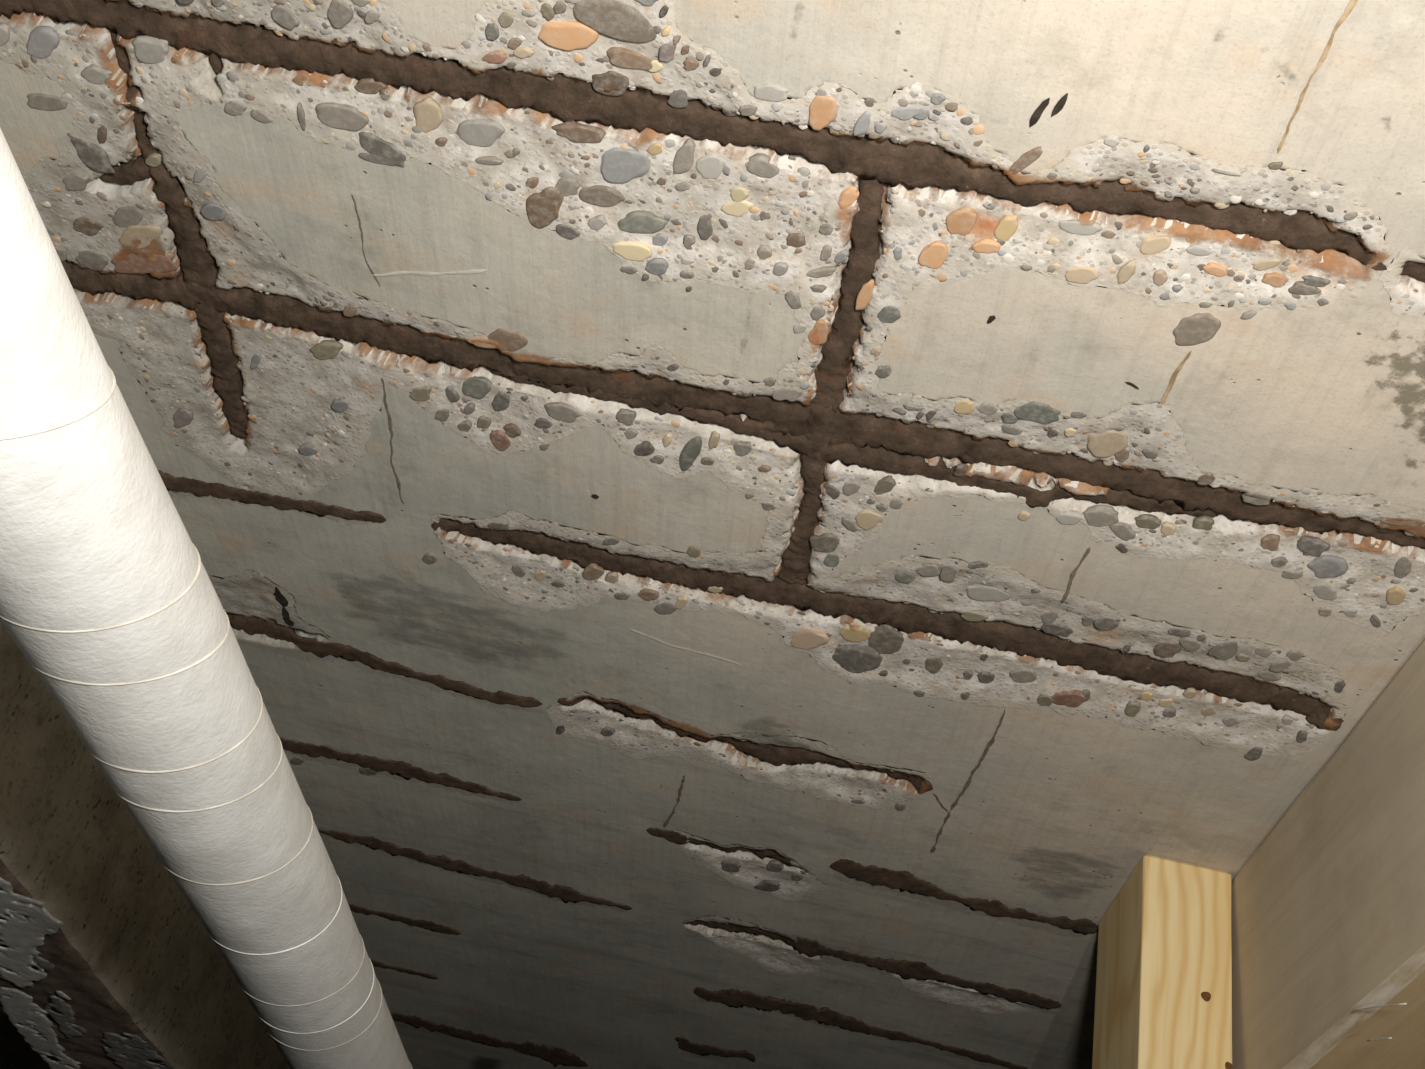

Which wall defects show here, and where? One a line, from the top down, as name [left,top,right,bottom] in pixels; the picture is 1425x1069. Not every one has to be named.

crack [1278,0,1358,153]
corrosion [114,238,181,281]
corrosion [973,219,999,236]
spalling [0,0,1425,761]
damp [1366,334,1425,442]
spalling [208,569,933,811]
peeling [0,877,178,1069]
spalling [348,904,461,935]
spalling [317,828,632,910]
spalling [646,827,1099,937]